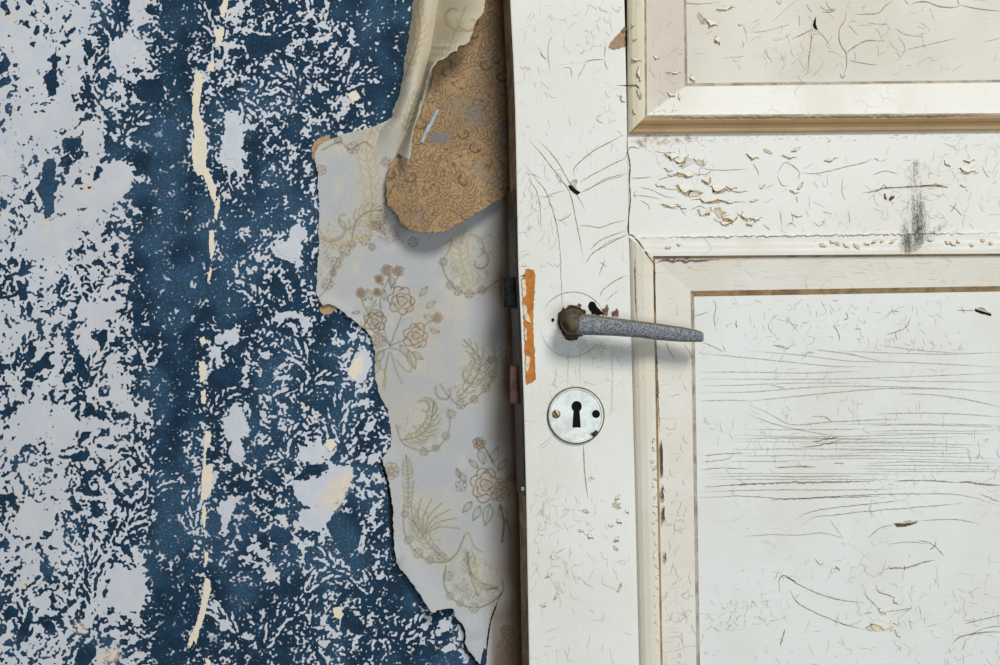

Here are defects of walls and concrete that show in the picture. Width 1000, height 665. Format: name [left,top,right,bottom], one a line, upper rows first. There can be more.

peeling [213,0,228,48]
peeling [191,61,220,282]
peeling [224,119,241,167]
peeling [656,152,766,227]
crack [518,0,1000,311]
peeling [199,327,237,404]
peeling [348,357,363,380]
peeling [227,412,246,459]
peeling [201,430,213,528]
peeling [223,503,235,525]
crack [663,300,1000,665]
peeling [187,550,219,647]